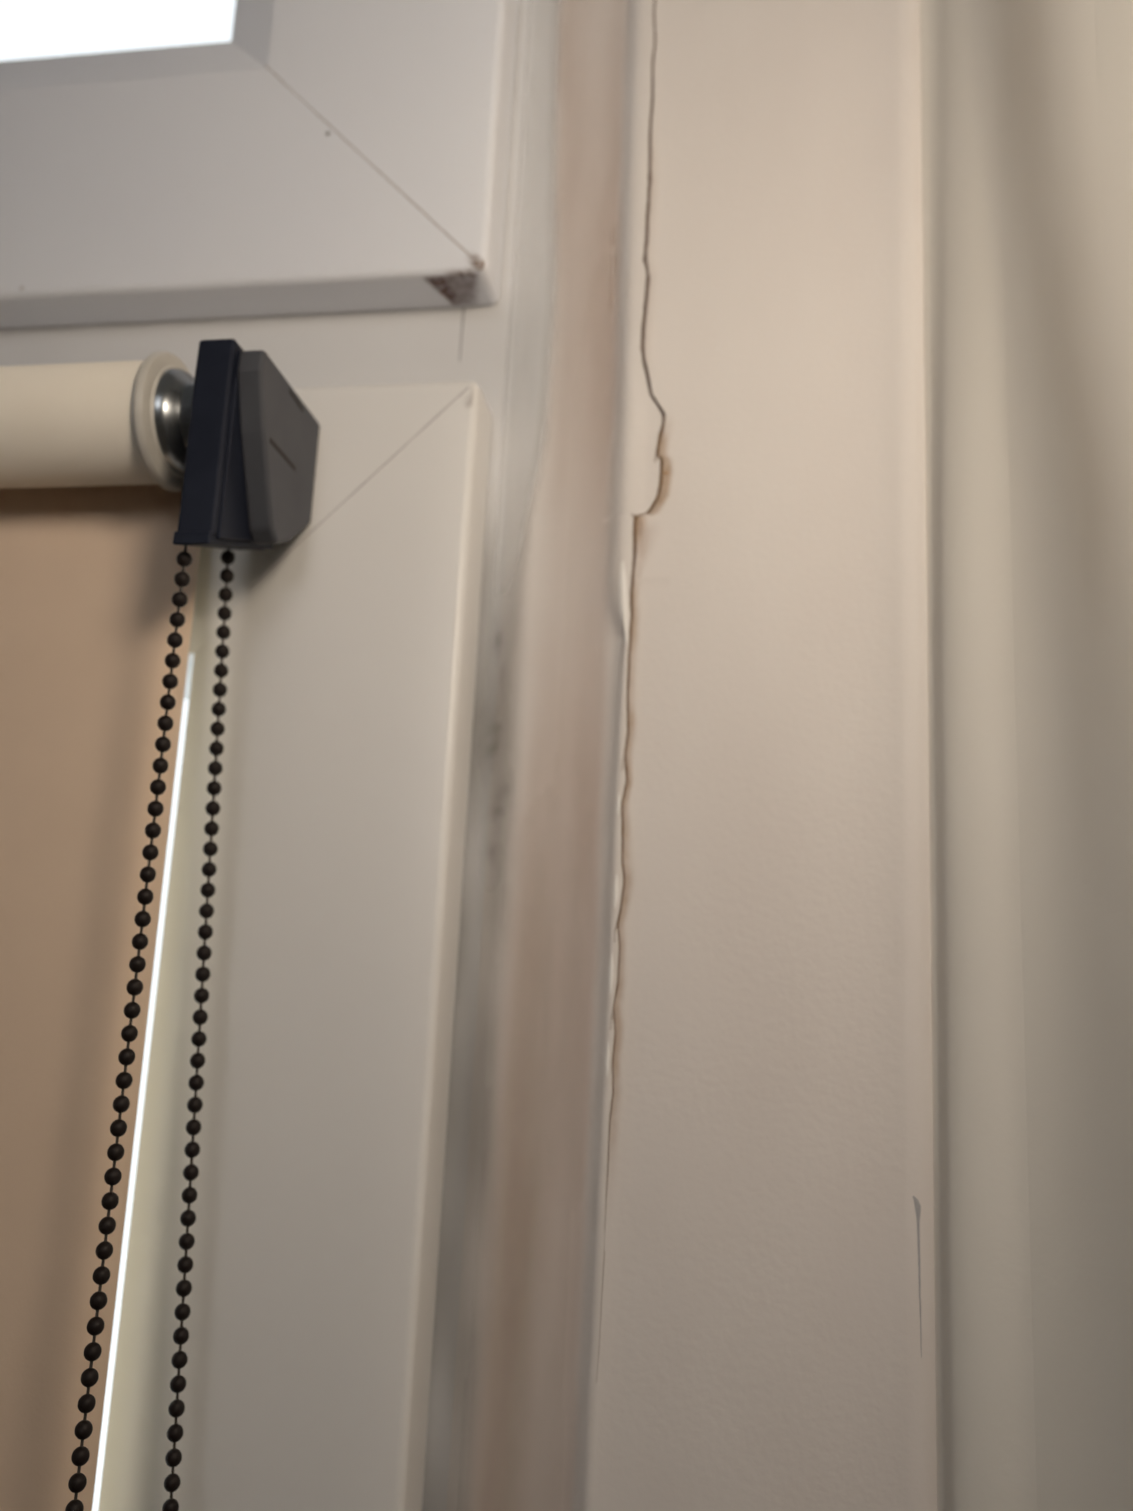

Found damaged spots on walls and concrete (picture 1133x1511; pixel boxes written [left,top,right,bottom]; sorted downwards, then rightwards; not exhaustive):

crack [596,0,665,1383]